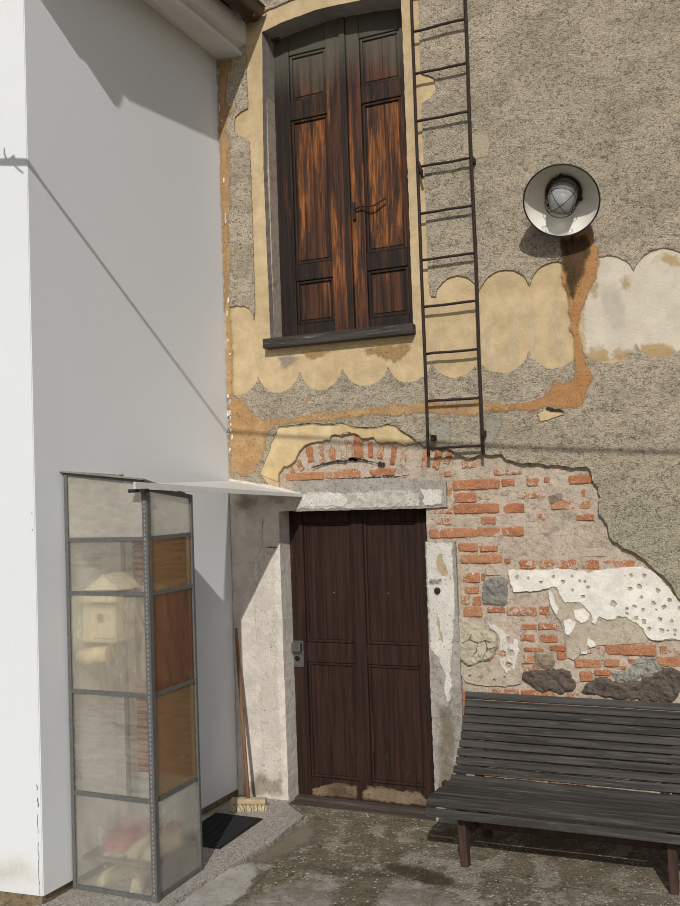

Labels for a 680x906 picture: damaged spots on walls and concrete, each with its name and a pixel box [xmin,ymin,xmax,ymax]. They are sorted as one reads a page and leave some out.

rust [217,60,600,476]
crack [312,457,407,479]
flaking render [260,423,680,795]